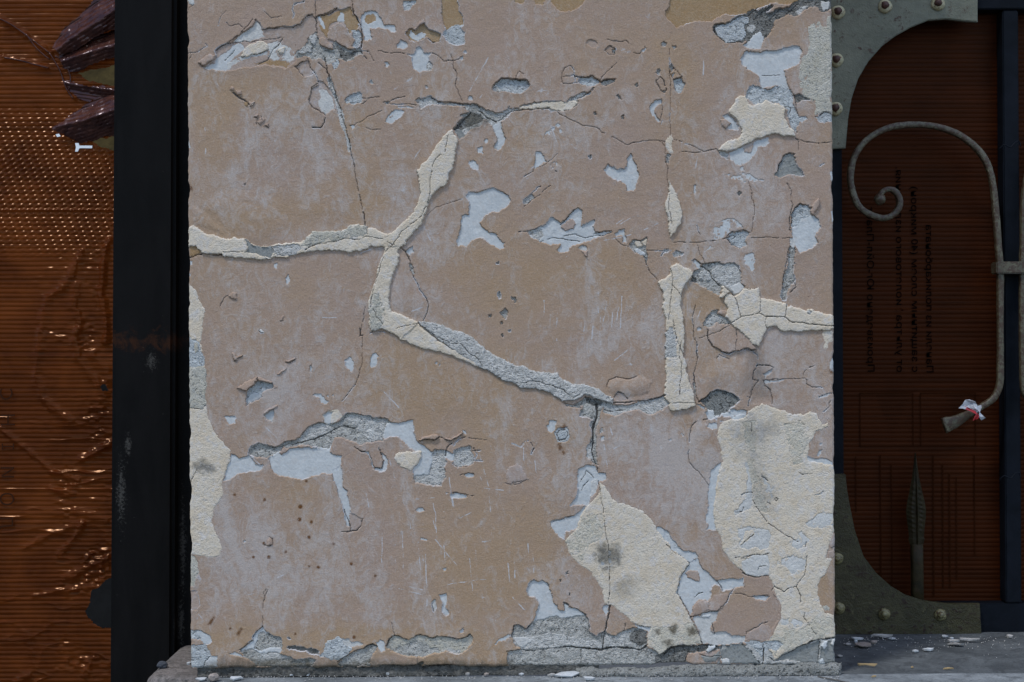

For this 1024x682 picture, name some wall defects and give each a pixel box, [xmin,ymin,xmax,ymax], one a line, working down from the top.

peeling [198,0,467,128]
crack [351,0,463,102]
crack [559,49,711,181]
flaking render [665,0,832,196]
crack [188,60,637,404]
peeling [457,186,550,249]
peeling [519,208,648,263]
crack [748,181,793,239]
crack [616,225,834,411]
flaking render [189,261,482,610]
flaking render [495,389,896,680]
flaking render [230,616,473,676]